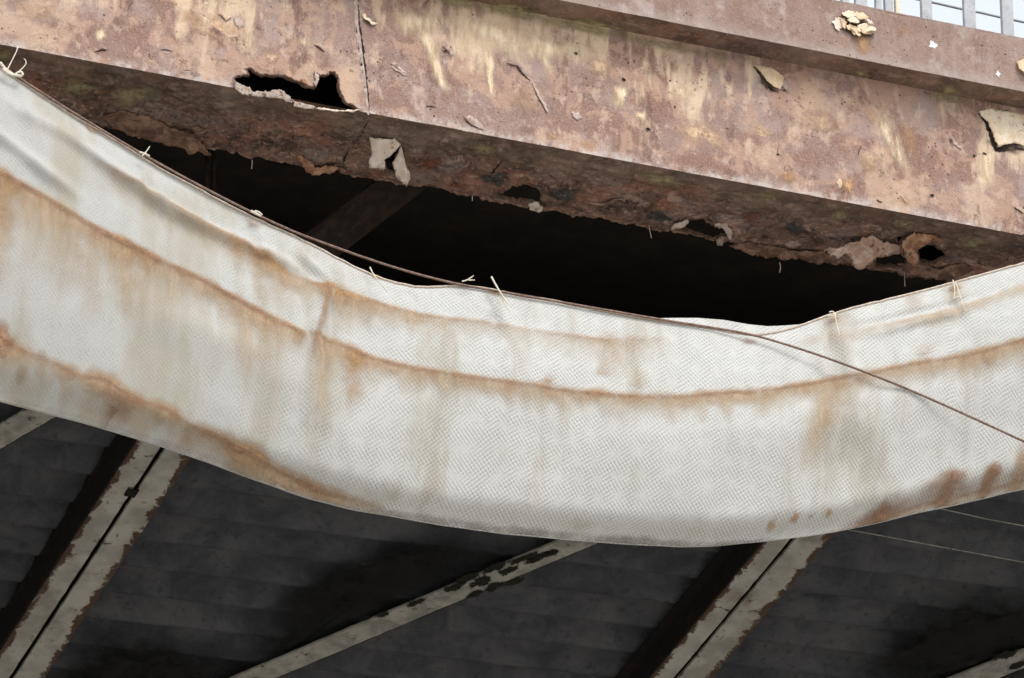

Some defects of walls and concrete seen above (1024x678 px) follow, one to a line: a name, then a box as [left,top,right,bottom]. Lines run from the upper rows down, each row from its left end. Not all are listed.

peeling [832,10,876,37]
peeling [232,79,360,112]
crack [331,0,370,173]
rust [614,87,627,106]
peeling [102,110,212,156]
peeling [369,137,410,187]
rust [871,116,910,164]
peeling [949,108,1024,157]
rust [0,168,159,273]
rust [240,239,292,281]
peeling [714,215,973,280]
rust [179,267,303,337]